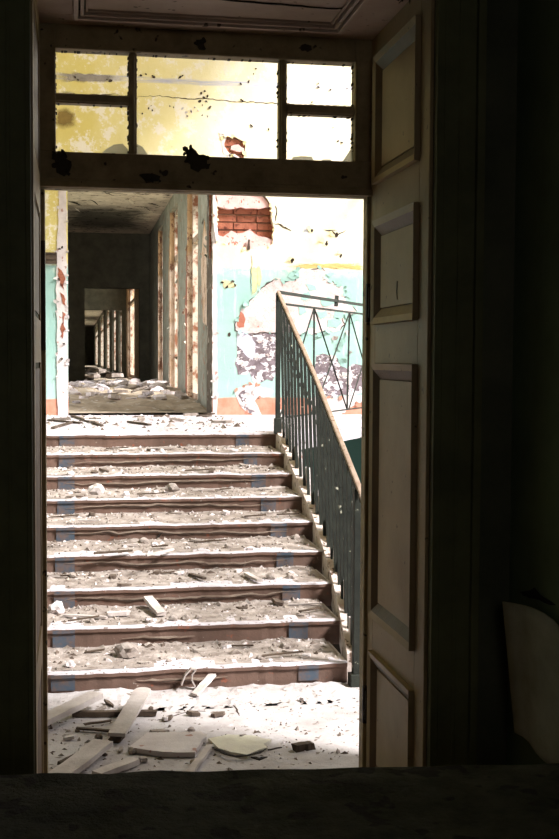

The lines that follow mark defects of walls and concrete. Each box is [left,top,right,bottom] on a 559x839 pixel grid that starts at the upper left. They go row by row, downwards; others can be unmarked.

crack [223,0,342,10]
crack [139,95,347,106]
flaking render [219,133,247,158]
flaking render [53,191,80,415]
peeling [200,195,362,415]